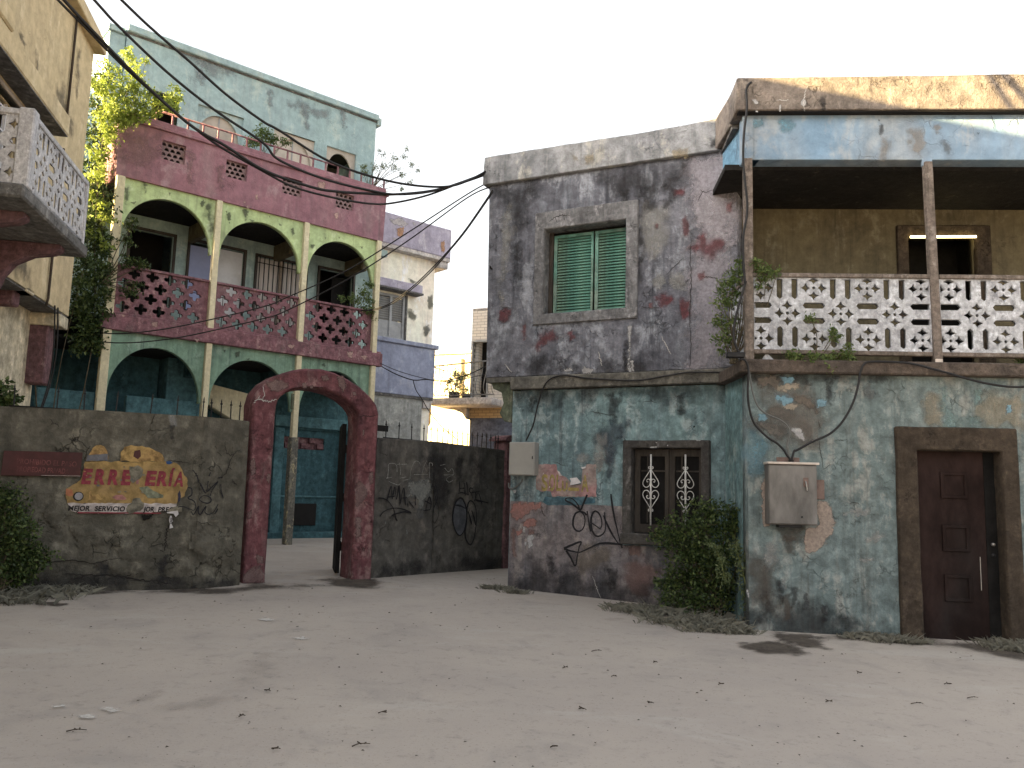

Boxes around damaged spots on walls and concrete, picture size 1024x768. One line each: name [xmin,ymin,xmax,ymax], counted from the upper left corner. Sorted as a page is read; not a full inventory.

water stain [603,163,685,210]
peeling [649,140,739,370]
water stain [606,326,644,372]
peeling [775,377,800,410]
peeling [510,490,541,556]
peeling [804,501,835,553]
crack [46,558,171,586]
water stain [149,555,283,593]
water stain [741,588,858,656]
water stain [925,637,1024,659]